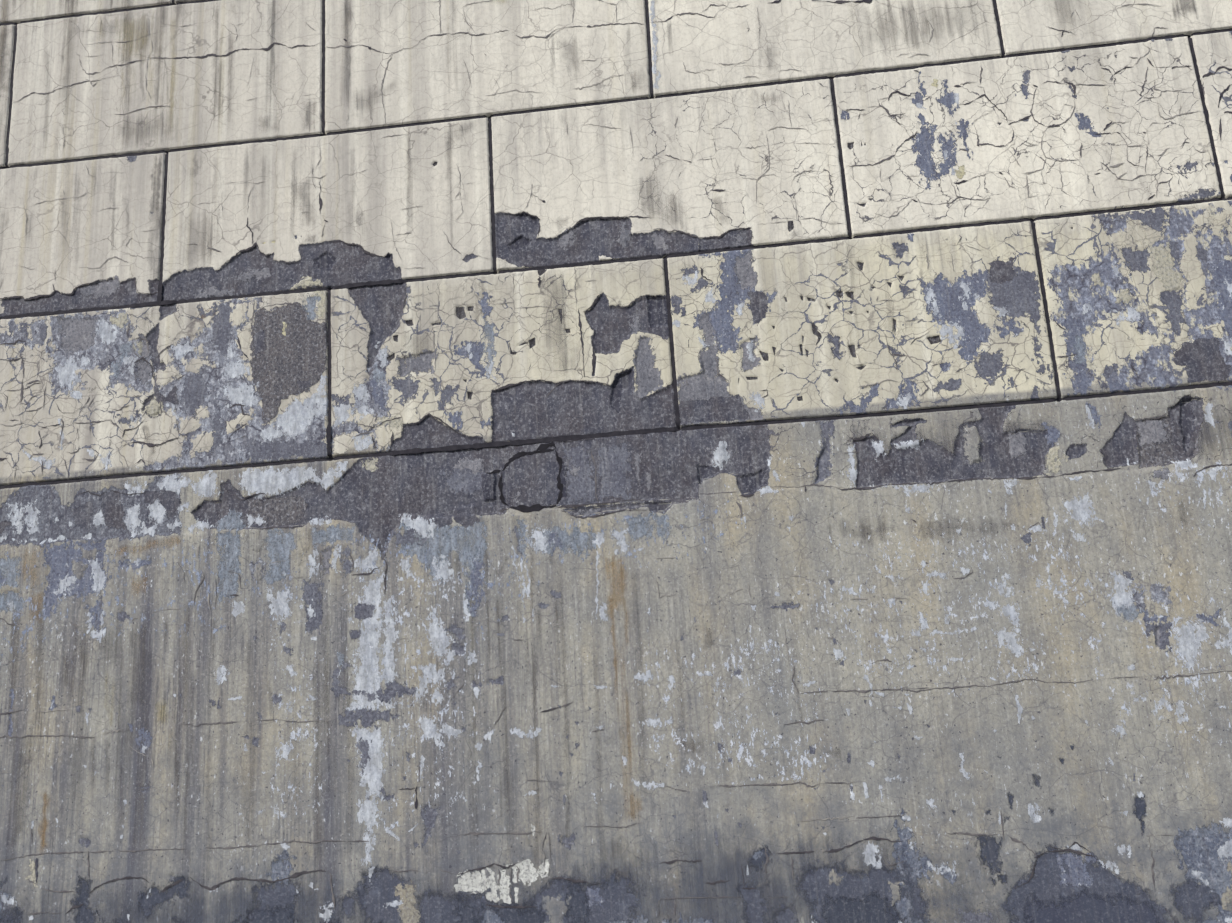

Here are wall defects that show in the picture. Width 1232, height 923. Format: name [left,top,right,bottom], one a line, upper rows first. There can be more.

crack [0,0,1232,598]
peeling [813,160,1232,490]
water stain [238,457,378,499]
flaking render [0,211,869,655]
water stain [1127,459,1232,535]
crack [130,543,241,623]
water stain [797,476,1232,743]
crack [784,628,1232,751]
crack [667,768,866,791]
peeling [452,859,551,904]
water stain [1002,844,1178,923]
peeling [1170,820,1232,923]